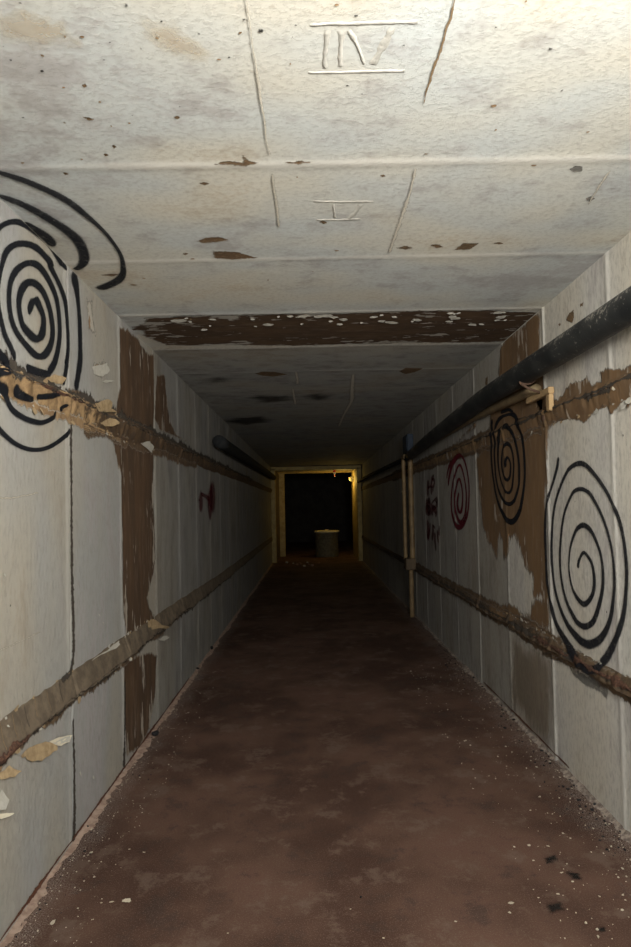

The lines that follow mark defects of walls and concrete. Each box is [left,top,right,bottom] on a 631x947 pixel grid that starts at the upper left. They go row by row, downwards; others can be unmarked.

crack [424,0,455,102]
peeling [215,155,256,167]
peeling [197,237,257,260]
peeling [43,374,75,396]
peeling [89,310,540,660]
peeling [476,365,631,705]
peeling [115,652,157,756]
peeling [14,735,72,762]
peeling [0,765,21,819]